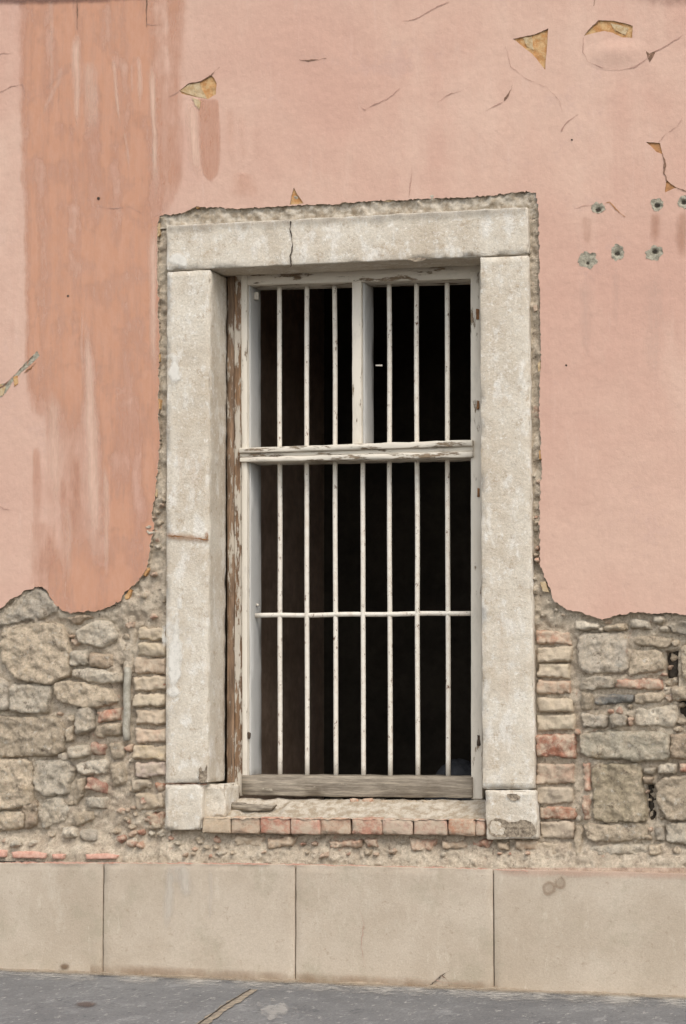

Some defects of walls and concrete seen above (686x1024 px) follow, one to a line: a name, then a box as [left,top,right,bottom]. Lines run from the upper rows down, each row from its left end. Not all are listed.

spalling [514,29,548,69]
spalling [585,20,633,38]
spalling [170,71,217,110]
crack [486,47,575,131]
spalling [647,142,685,192]
crack [287,221,295,267]
leakage [23,0,178,613]
spalling [0,189,686,873]